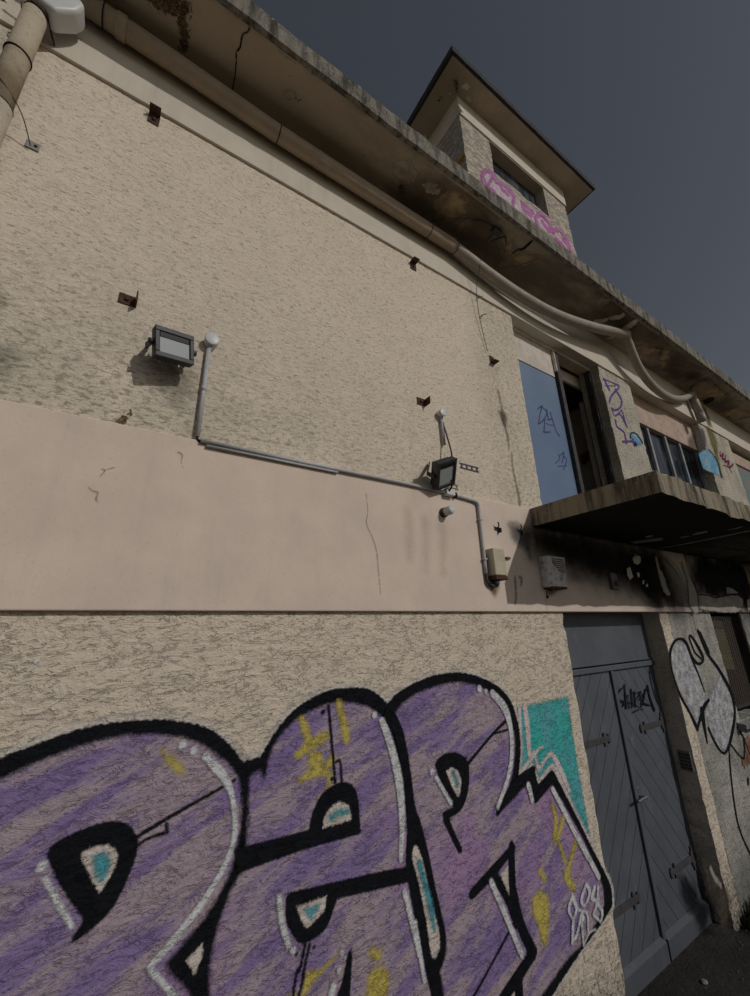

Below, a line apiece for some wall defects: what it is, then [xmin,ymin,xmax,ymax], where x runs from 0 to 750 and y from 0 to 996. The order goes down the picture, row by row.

spalling [147,0,193,56]
crack [232,27,250,90]
water stain [512,526,748,613]